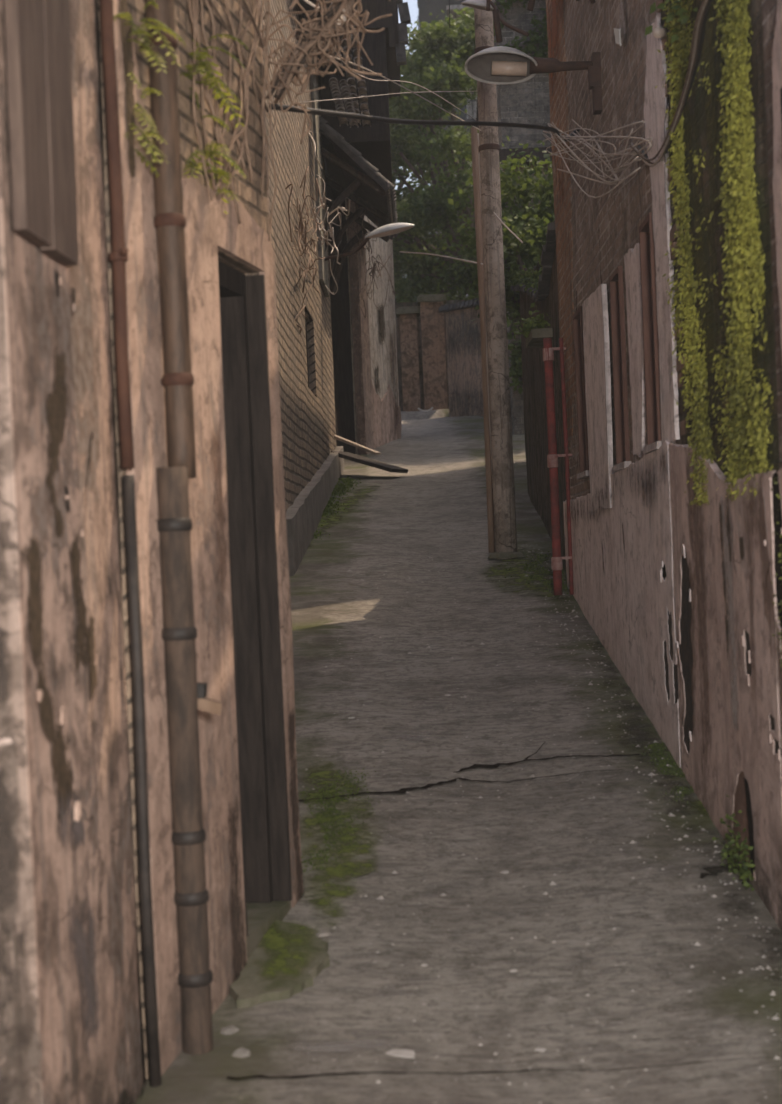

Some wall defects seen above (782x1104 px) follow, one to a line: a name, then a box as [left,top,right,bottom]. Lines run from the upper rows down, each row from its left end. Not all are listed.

spalling [664,544,693,753]
crack [514,742,639,781]